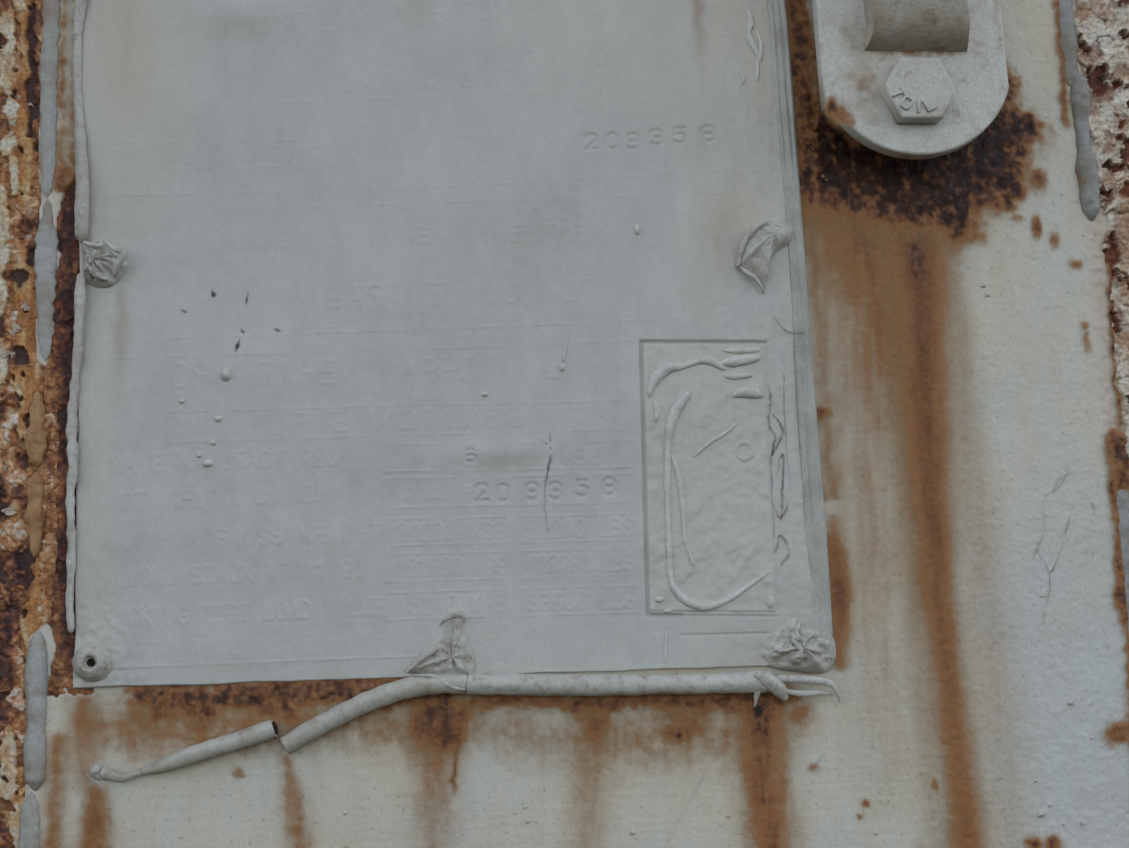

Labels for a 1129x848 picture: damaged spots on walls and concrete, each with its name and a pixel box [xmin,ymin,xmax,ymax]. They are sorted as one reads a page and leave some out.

rust [0,0,406,848]
rust [785,0,1070,848]
peeling [1073,0,1129,457]
rust [1104,237,1129,746]
rust [336,685,810,848]